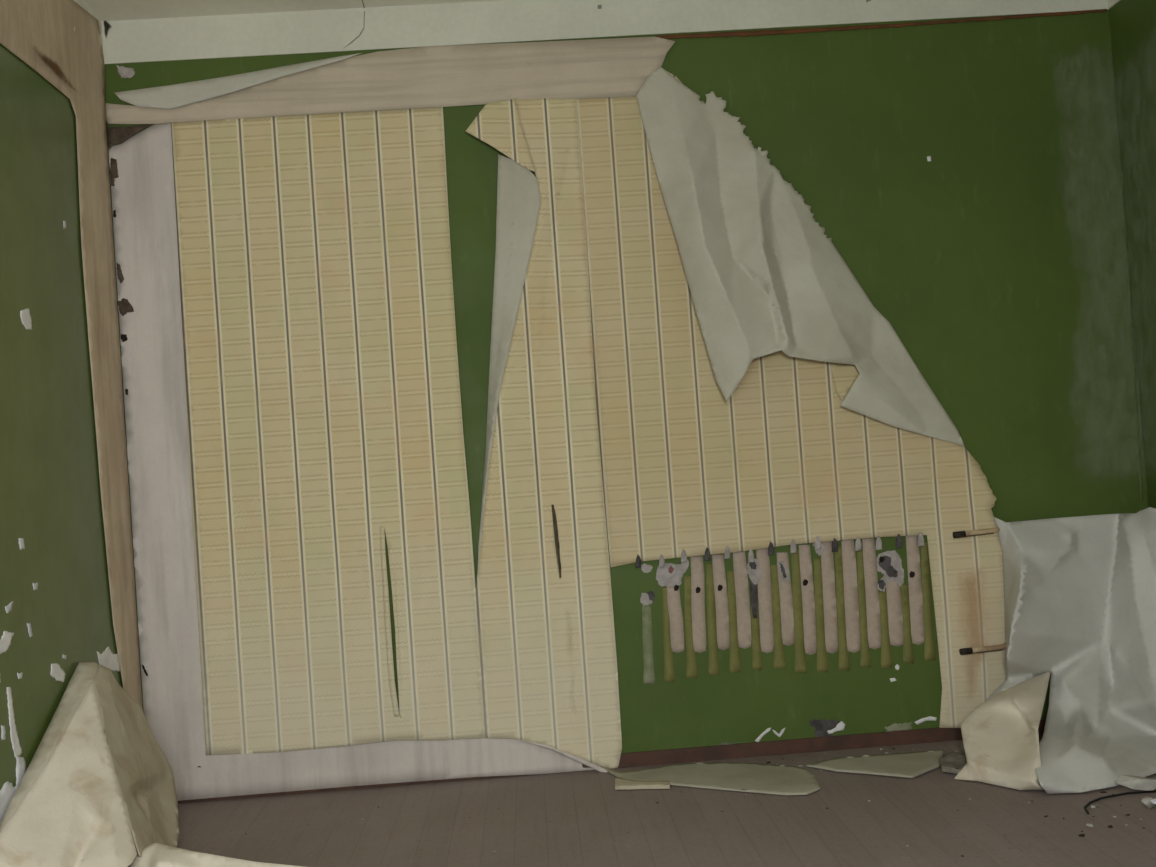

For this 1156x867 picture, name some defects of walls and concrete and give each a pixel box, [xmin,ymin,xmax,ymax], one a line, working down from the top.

peeling [20,308,32,330]
flaking render [640,559,689,605]
flaking render [777,561,790,584]
flaking render [876,550,904,592]
peeling [0,631,14,654]
peeling [50,655,66,682]
peeling [97,647,121,671]
peeling [755,728,785,742]
flaking render [809,718,845,737]
peeling [884,716,937,732]
peeling [0,672,27,823]